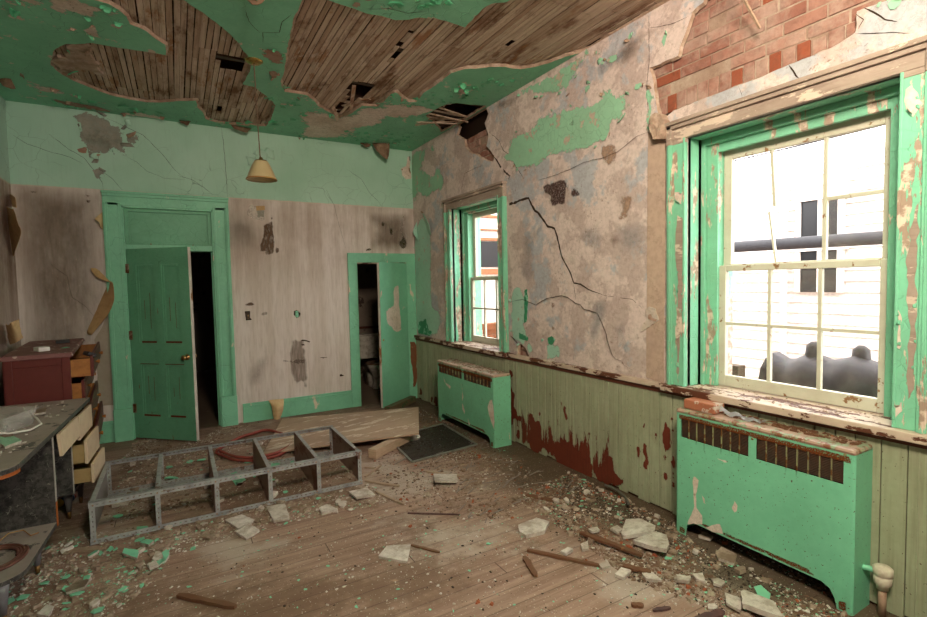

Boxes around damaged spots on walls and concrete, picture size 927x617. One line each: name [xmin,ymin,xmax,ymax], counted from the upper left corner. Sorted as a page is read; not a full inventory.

peeling [0,46,275,179]
flaking render [261,0,903,171]
peeling [904,85,923,117]
crack [462,132,645,369]
peeling [891,204,920,420]
peeling [509,370,623,486]